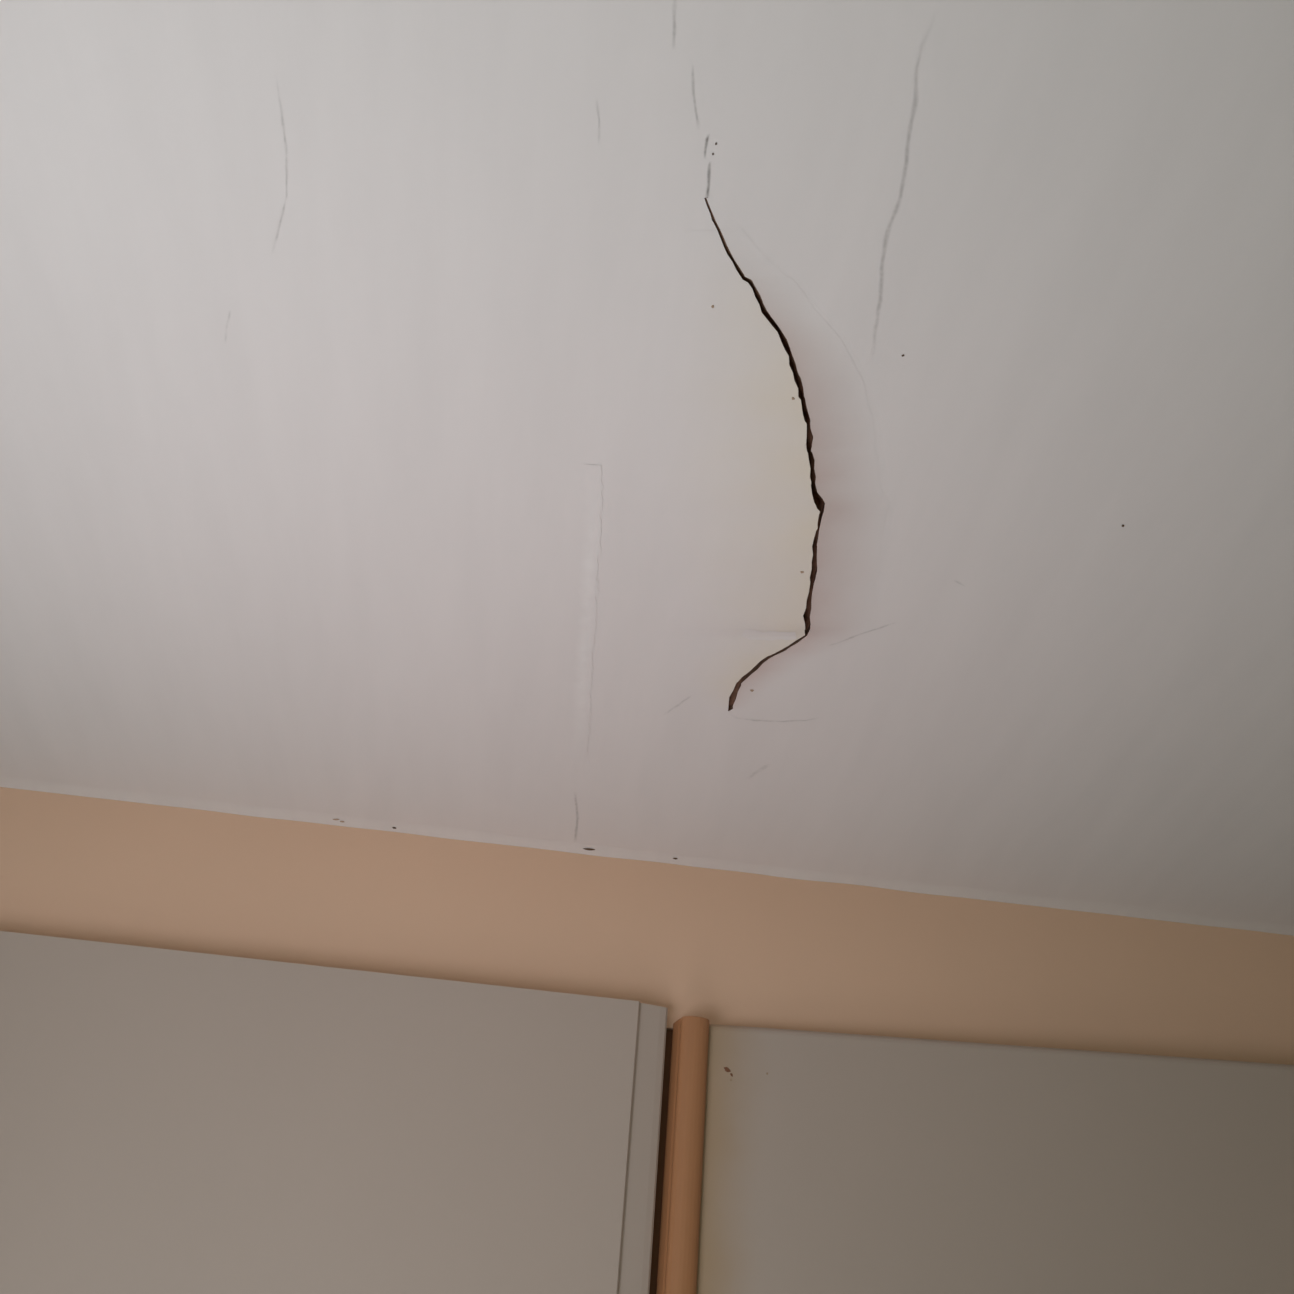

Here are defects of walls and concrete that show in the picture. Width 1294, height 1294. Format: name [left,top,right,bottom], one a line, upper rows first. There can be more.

crack [704,197,825,711]